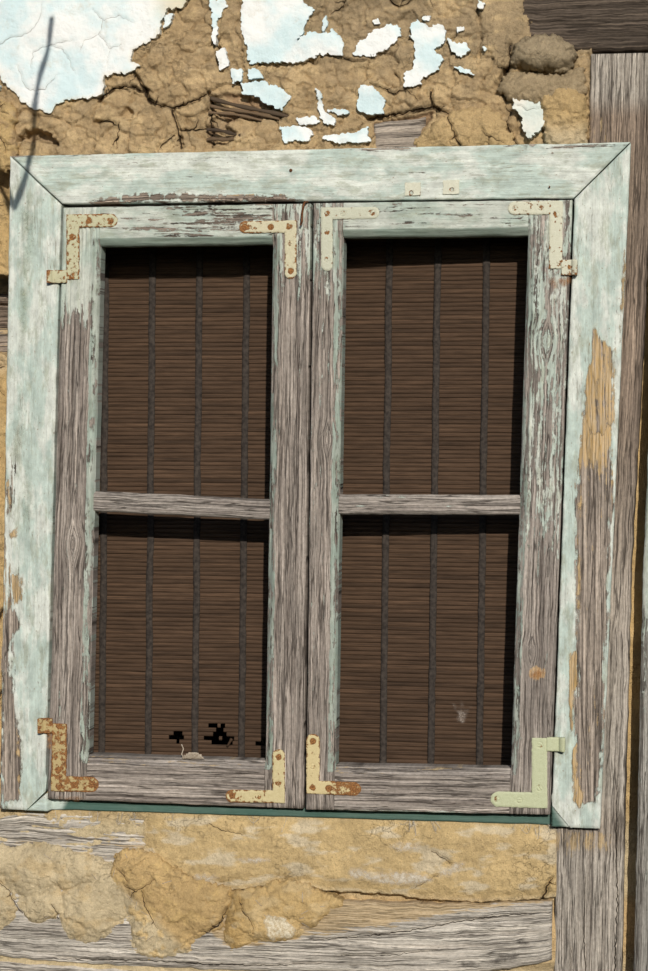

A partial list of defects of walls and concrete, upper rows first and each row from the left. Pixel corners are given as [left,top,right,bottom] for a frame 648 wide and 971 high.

crack [2,4,124,90]
peeling [0,0,188,114]
peeling [209,0,475,111]
crack [99,72,218,148]
peeling [279,85,386,144]
peeling [512,98,545,139]
peeling [569,329,616,808]
crack [116,868,158,929]
crack [201,900,254,934]
crack [317,878,556,964]
crack [56,958,291,966]